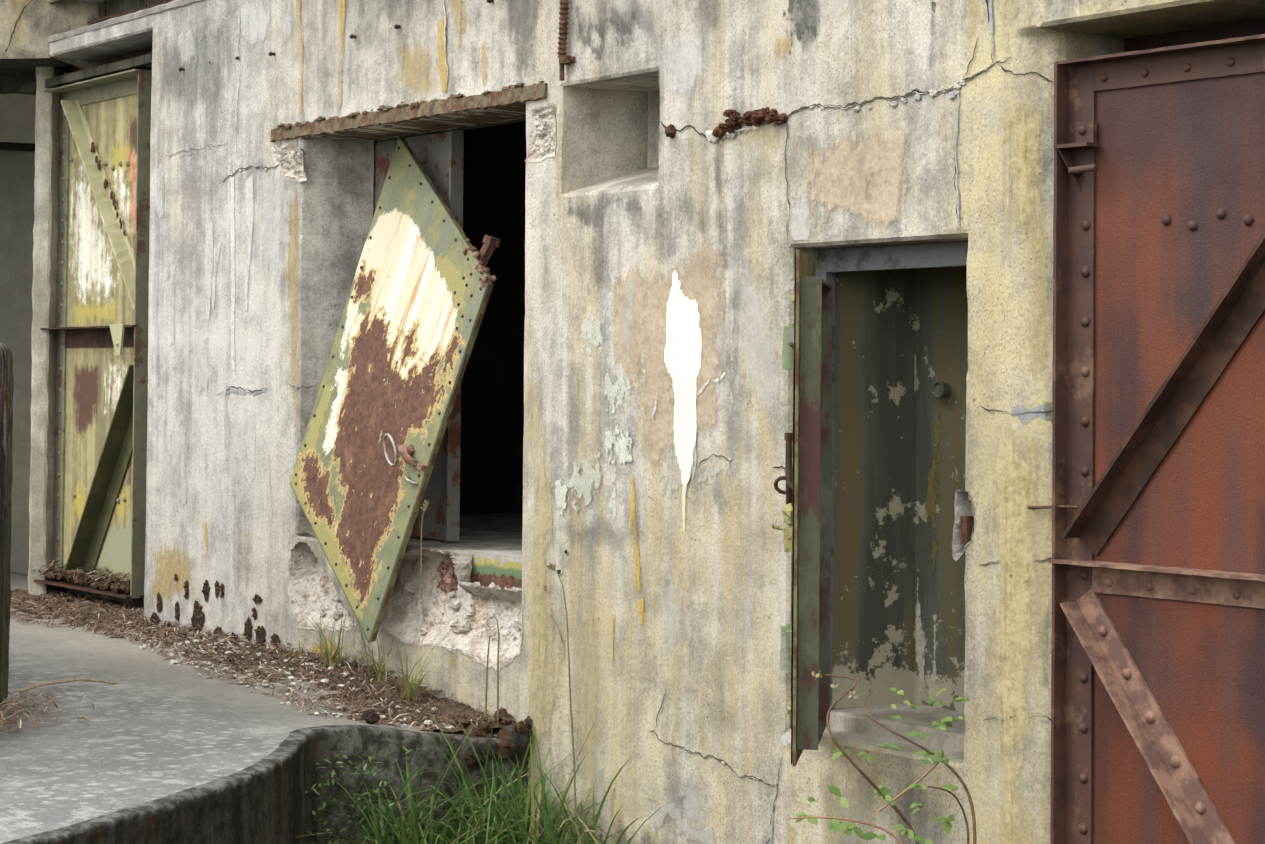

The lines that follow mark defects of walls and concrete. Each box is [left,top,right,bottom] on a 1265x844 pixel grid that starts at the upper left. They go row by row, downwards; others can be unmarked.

crack [164,11,284,182]
spalling [525,103,557,163]
crack [659,121,707,138]
corrosion [705,107,788,143]
damp [783,0,817,55]
crack [784,0,1054,241]
flaking render [553,244,733,530]
spalling [139,574,365,722]
spalling [378,547,524,672]
spalling [915,413,976,692]
spalling [370,692,533,770]
crack [649,687,783,844]